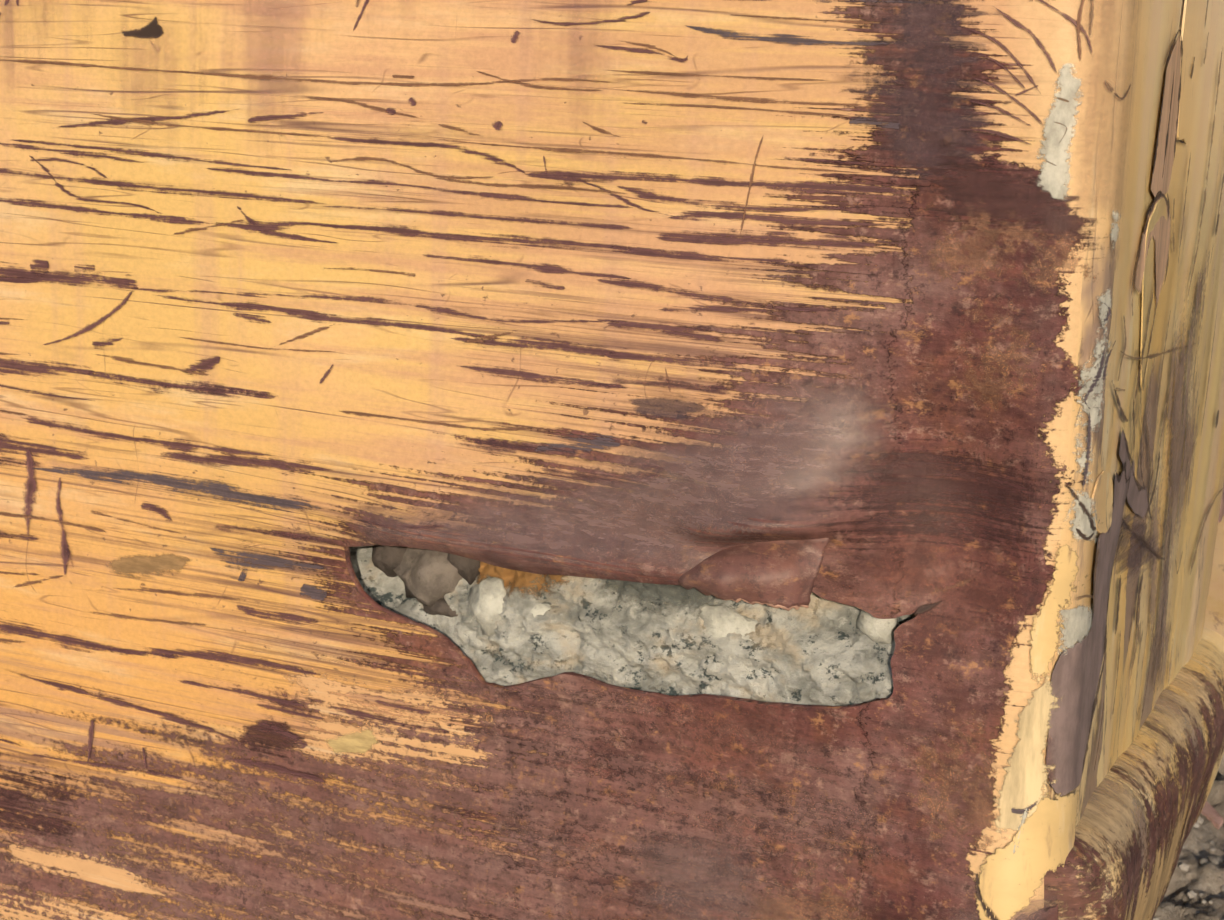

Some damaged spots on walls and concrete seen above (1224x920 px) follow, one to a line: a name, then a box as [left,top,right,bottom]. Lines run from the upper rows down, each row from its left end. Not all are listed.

rust [820,0,995,76]
rust [849,39,1030,94]
rust [811,94,908,116]
rust [844,114,894,123]
rust [937,98,1008,116]
rust [302,434,659,521]
peeling [976,0,1210,920]
rust [111,554,190,578]
spalling [349,544,917,706]
rust [269,687,323,716]
rust [1020,670,1224,920]